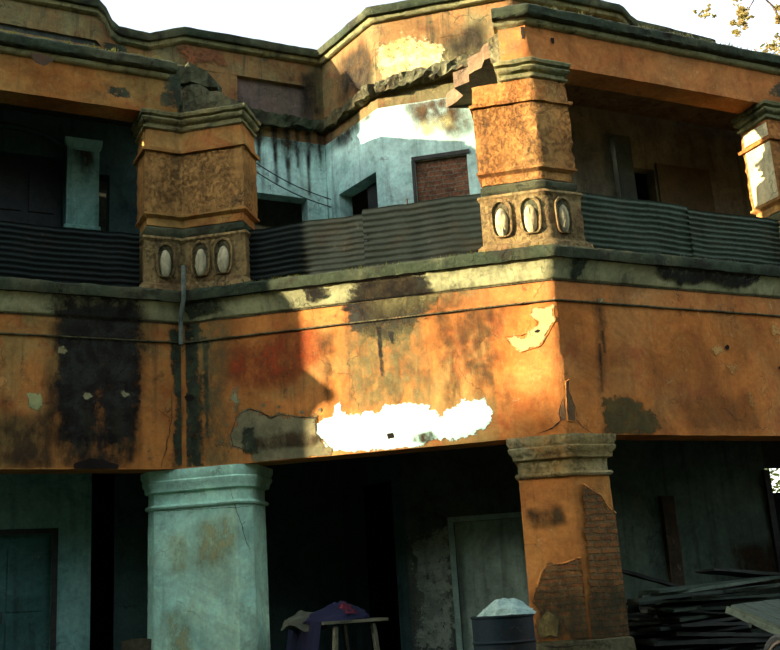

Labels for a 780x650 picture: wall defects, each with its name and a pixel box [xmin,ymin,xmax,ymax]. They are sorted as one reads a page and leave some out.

peeling [376,32,445,79]
water stain [254,127,321,195]
water stain [655,265,761,288]
water stain [341,272,476,405]
water stain [460,308,499,392]
peeling [503,304,556,352]
water stain [0,293,144,467]
spalling [220,404,333,462]
peeling [414,432,434,443]
water stain [602,395,662,434]
spalling [533,483,629,639]